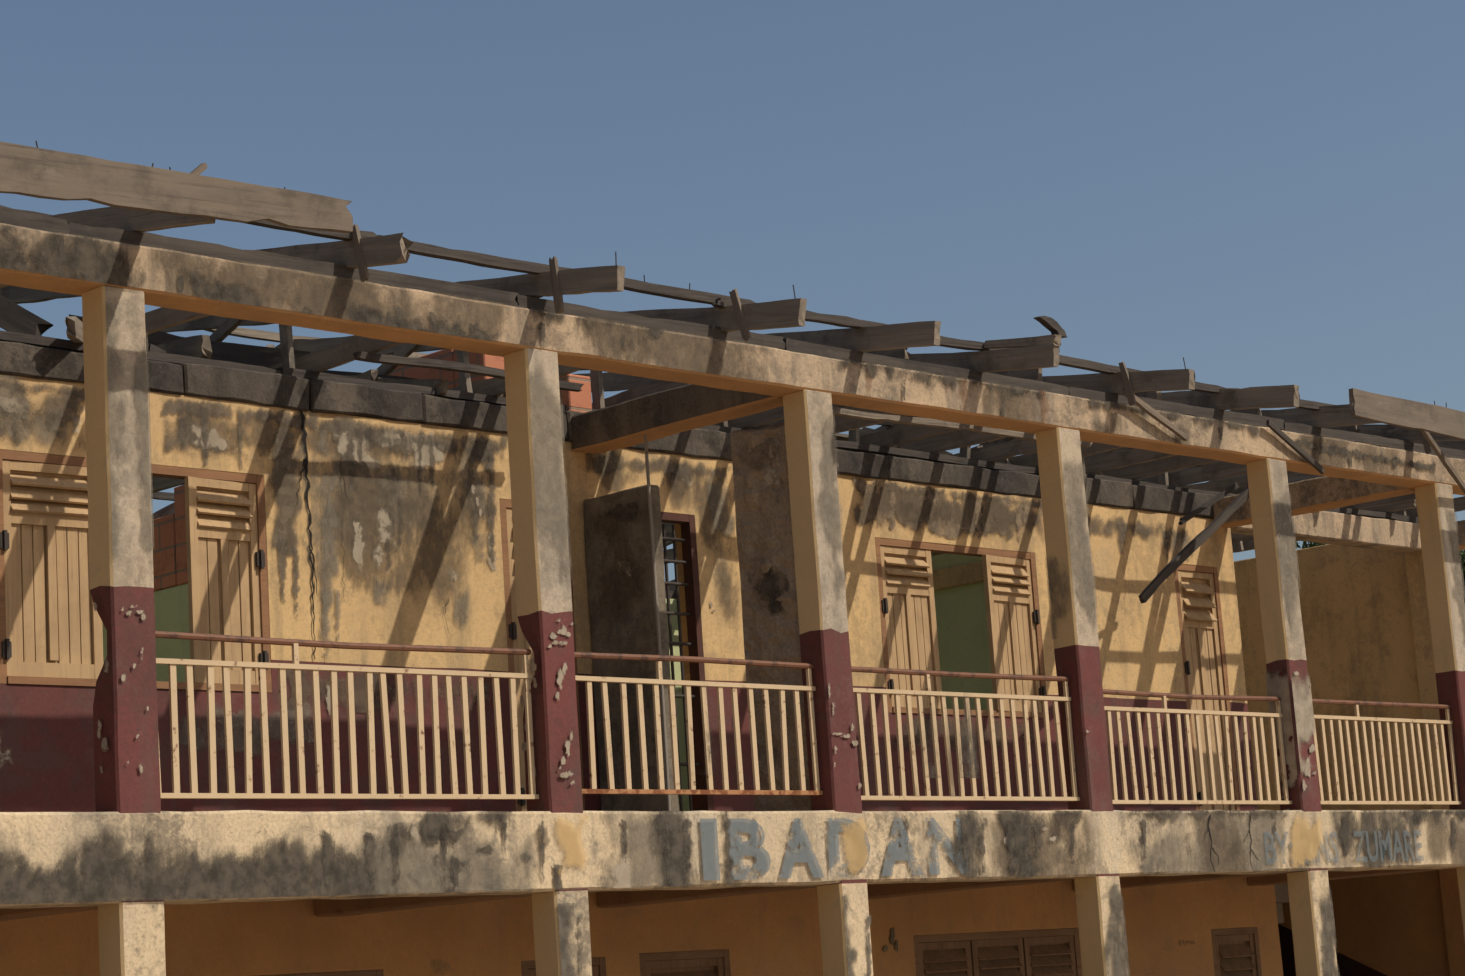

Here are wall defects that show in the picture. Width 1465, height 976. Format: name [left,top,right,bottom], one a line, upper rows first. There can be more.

leakage [158,248,505,341]
leakage [106,304,508,656]
crack [296,411,350,659]
peeling [353,510,396,567]
peeling [548,619,574,699]
peeling [97,719,108,773]
leakage [182,669,404,755]
peeling [520,658,537,751]
peeling [559,732,575,785]
leakage [952,810,1092,879]
leakage [1129,810,1286,874]
leakage [0,811,583,976]